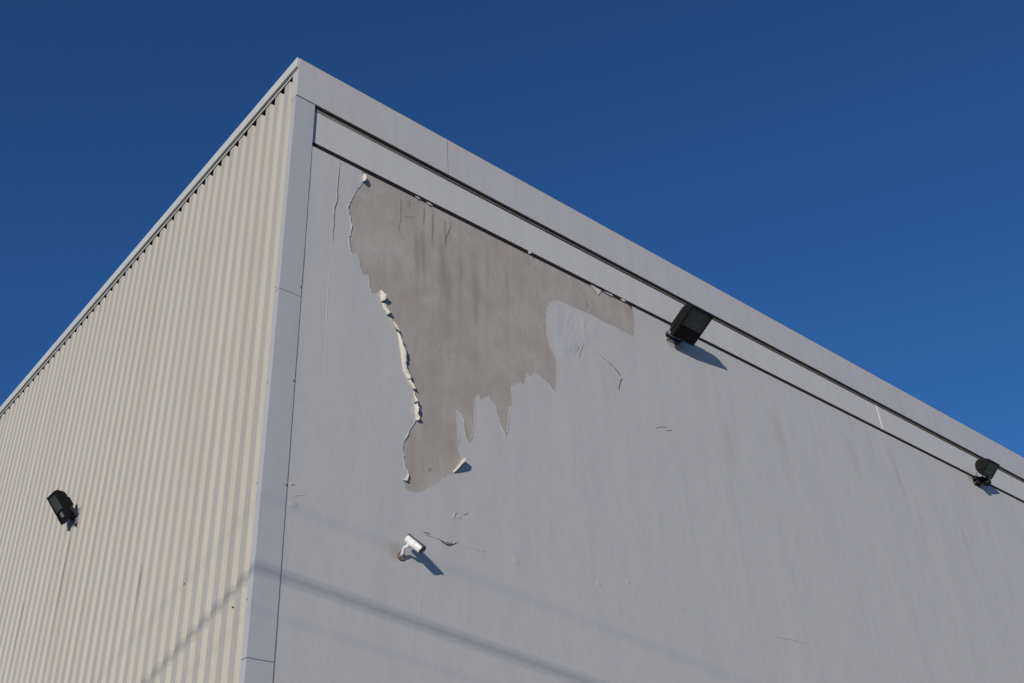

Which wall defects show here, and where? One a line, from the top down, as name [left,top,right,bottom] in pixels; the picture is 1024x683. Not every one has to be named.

crack [332,160,341,236]
peeling [347,171,636,493]
crack [577,344,622,388]
crack [425,532,456,546]